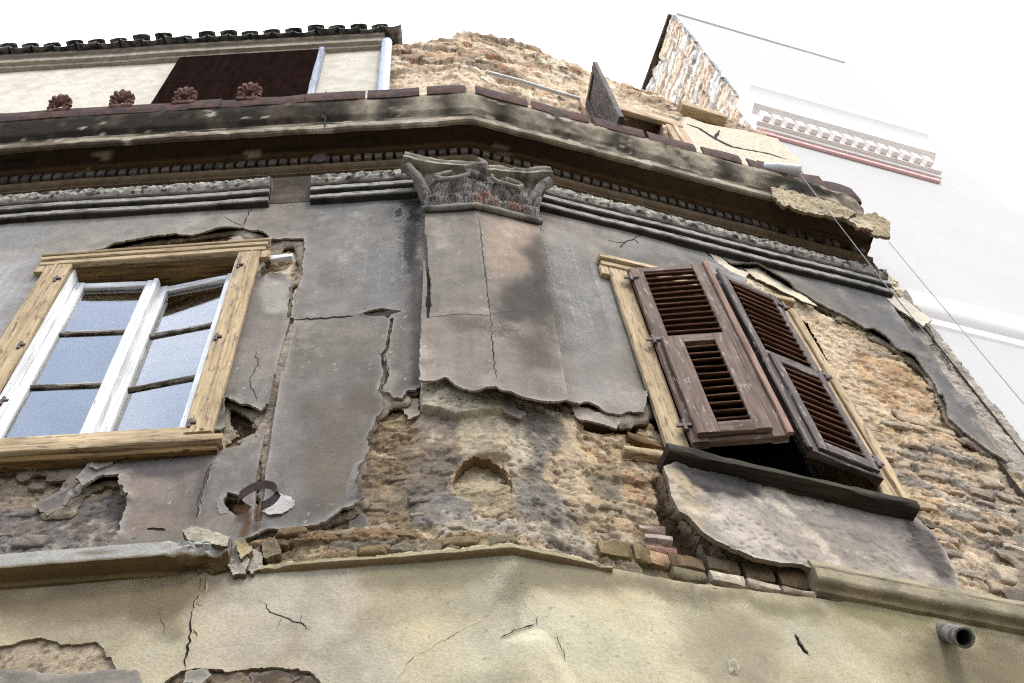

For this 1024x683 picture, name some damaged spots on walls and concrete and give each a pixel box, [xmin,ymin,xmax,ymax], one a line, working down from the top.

flaking render [173,236,245,245]
spalling [769,187,891,240]
crack [291,216,499,393]
flaking render [705,253,1024,598]
flaking render [0,475,126,554]
flaking render [182,379,839,602]
flaking render [0,640,142,683]
crack [156,578,208,670]
flaking render [169,668,320,683]
crack [260,601,310,630]